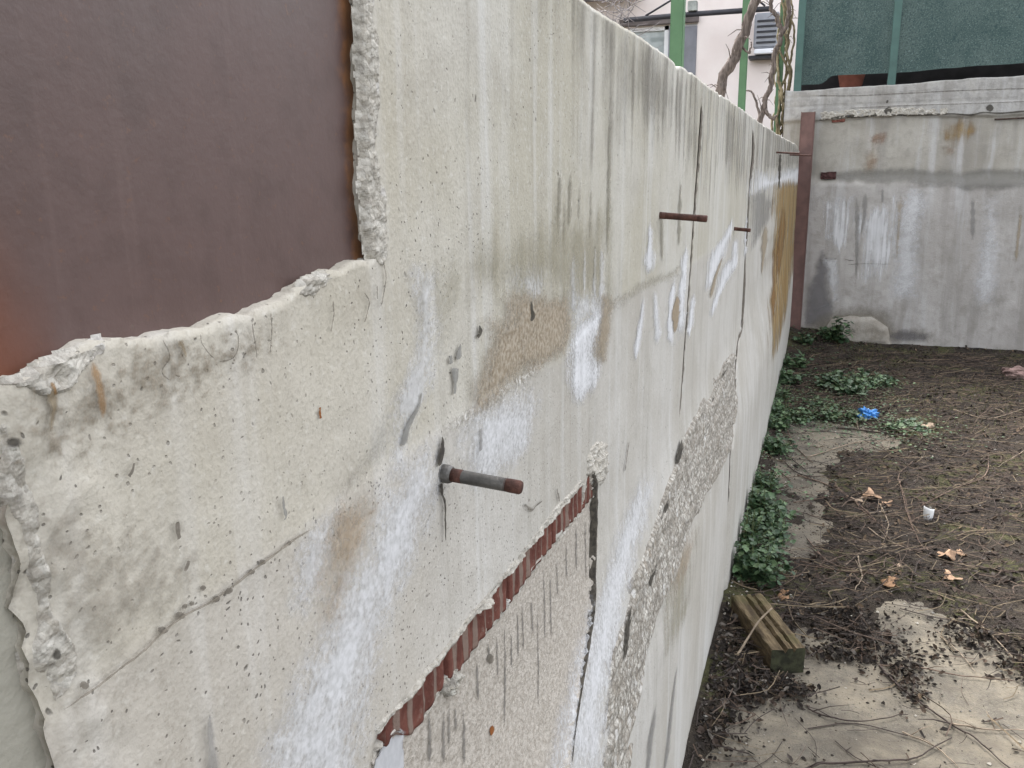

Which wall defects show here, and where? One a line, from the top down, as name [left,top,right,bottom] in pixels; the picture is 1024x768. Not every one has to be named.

spalling [0,333,105,396]
corrosion [48,383,57,430]
corrosion [92,365,106,414]
spalling [351,0,388,266]
water stain [473,130,612,476]
water stain [634,189,696,358]
crack [679,108,703,415]
water stain [808,170,1024,339]
crack [70,531,308,706]
peeling [371,441,610,768]
crack [572,473,598,761]
spalling [600,353,738,768]